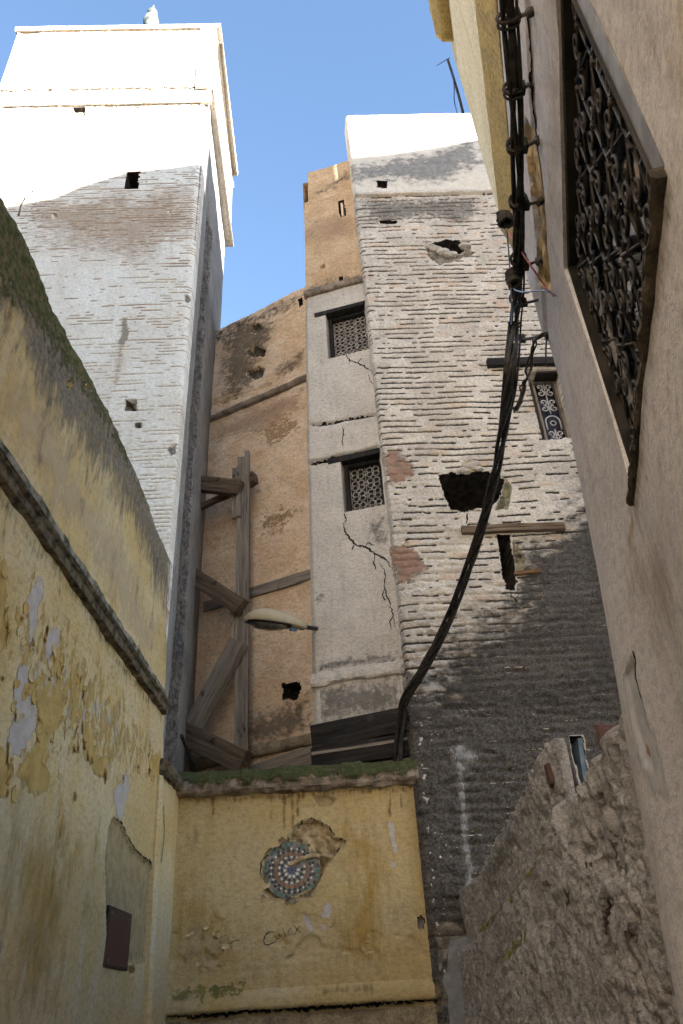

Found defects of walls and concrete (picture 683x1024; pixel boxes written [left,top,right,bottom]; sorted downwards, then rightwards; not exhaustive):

leakage [321,142,482,192]
spalling [424,242,472,266]
leakage [0,263,172,651]
spalling [496,476,512,510]
flaking render [0,218,212,965]
crack [343,514,395,627]
spalling [260,817,345,905]
leakage [448,743,516,887]